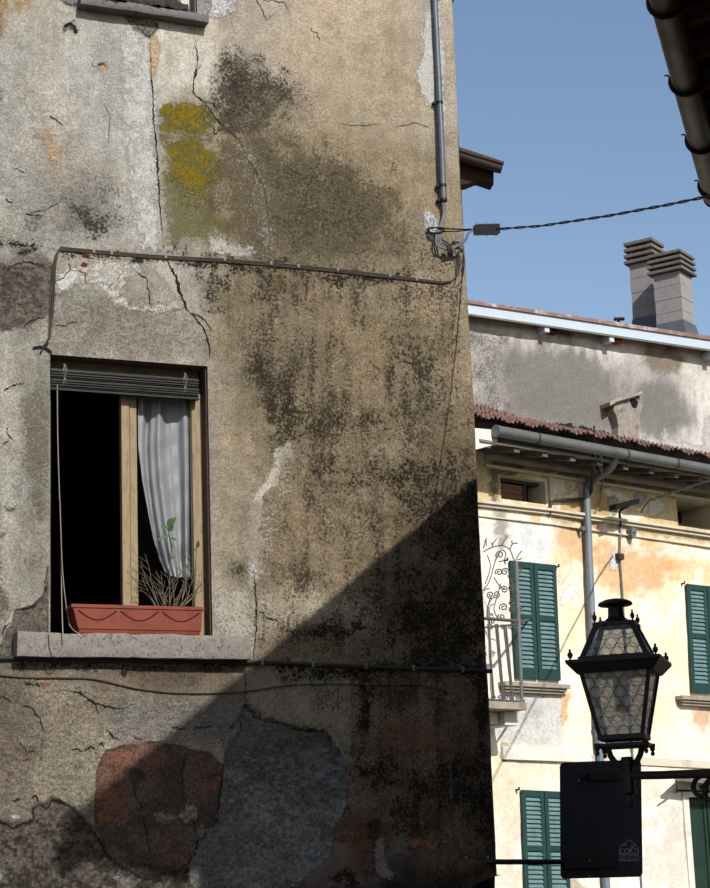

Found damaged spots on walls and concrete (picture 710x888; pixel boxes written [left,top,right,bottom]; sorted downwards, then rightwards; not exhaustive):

spalling [198,0,238,19]
crack [193,28,270,252]
crack [131,17,211,357]
flaking render [0,253,185,332]
crack [109,272,156,311]
leakage [9,25,487,694]
leakage [502,331,619,438]
leakage [639,346,691,435]
leakage [488,461,522,547]
leakage [534,468,710,499]
leakage [0,549,9,618]
flaking render [0,741,224,888]